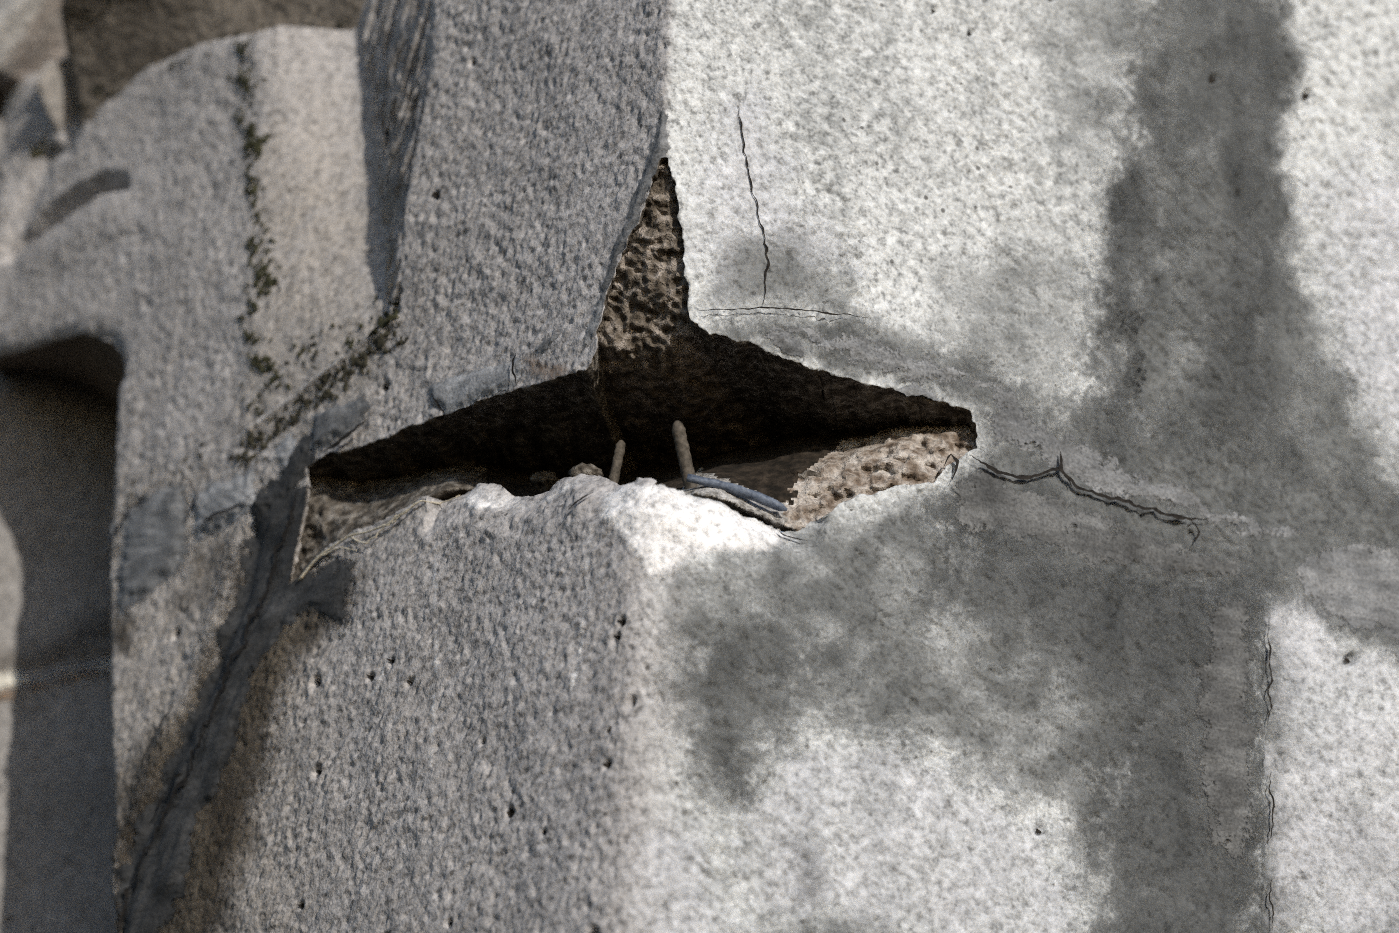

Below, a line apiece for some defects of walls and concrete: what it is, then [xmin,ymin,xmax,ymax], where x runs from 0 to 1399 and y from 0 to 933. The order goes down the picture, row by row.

crack [699,106,867,318]
leakage [463,490,512,509]
spalling [293,163,977,580]
leakage [602,0,1399,933]
crack [943,451,1212,545]
leakage [113,652,223,868]
leakage [157,577,359,933]